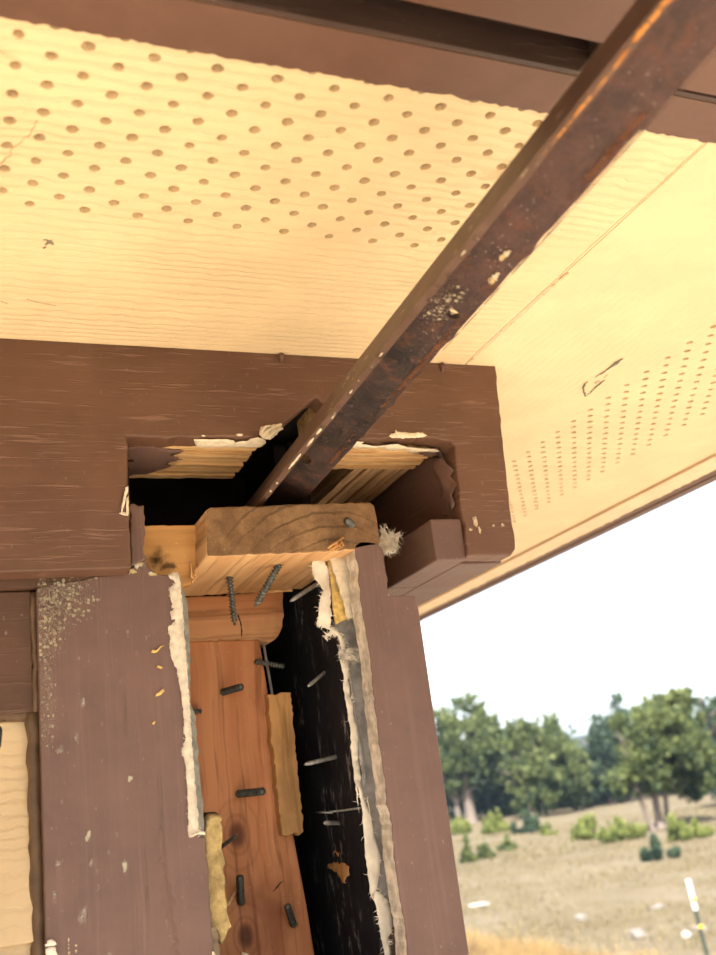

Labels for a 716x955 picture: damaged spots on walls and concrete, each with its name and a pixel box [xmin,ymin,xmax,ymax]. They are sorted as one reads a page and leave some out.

rust [542,0,672,156]
peeling [194,423,283,448]
peeling [352,430,439,454]
peeling [151,572,205,837]